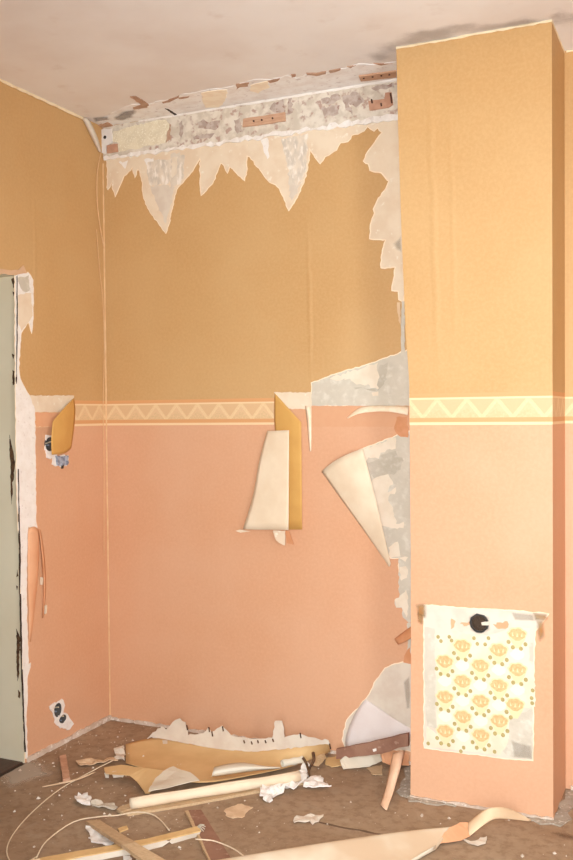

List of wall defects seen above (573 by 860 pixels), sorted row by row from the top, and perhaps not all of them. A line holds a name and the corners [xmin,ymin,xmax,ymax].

flaking render [97,61,397,128]
flaking render [311,351,409,406]
flaking render [9,273,57,758]
flaking render [364,431,411,623]